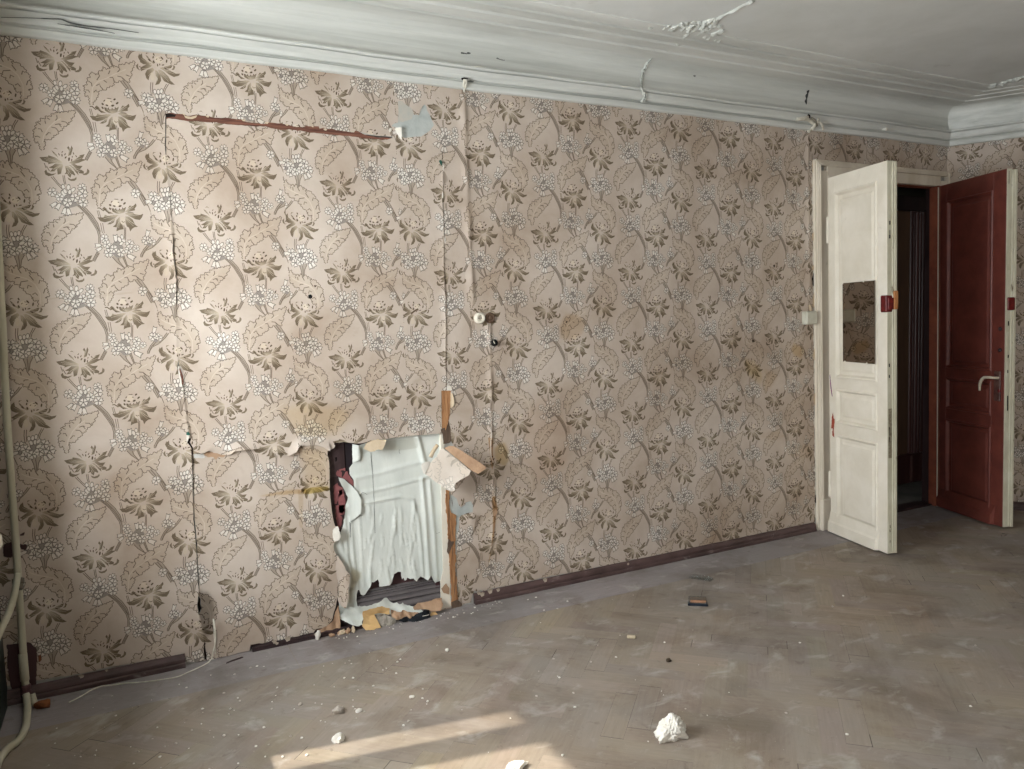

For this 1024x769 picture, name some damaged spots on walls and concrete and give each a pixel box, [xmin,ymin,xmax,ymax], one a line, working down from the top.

crack [639,0,755,103]
peeling [389,101,434,139]
crack [176,366,184,387]
crack [185,432,193,484]
crack [193,517,201,612]
peeling [449,495,473,567]